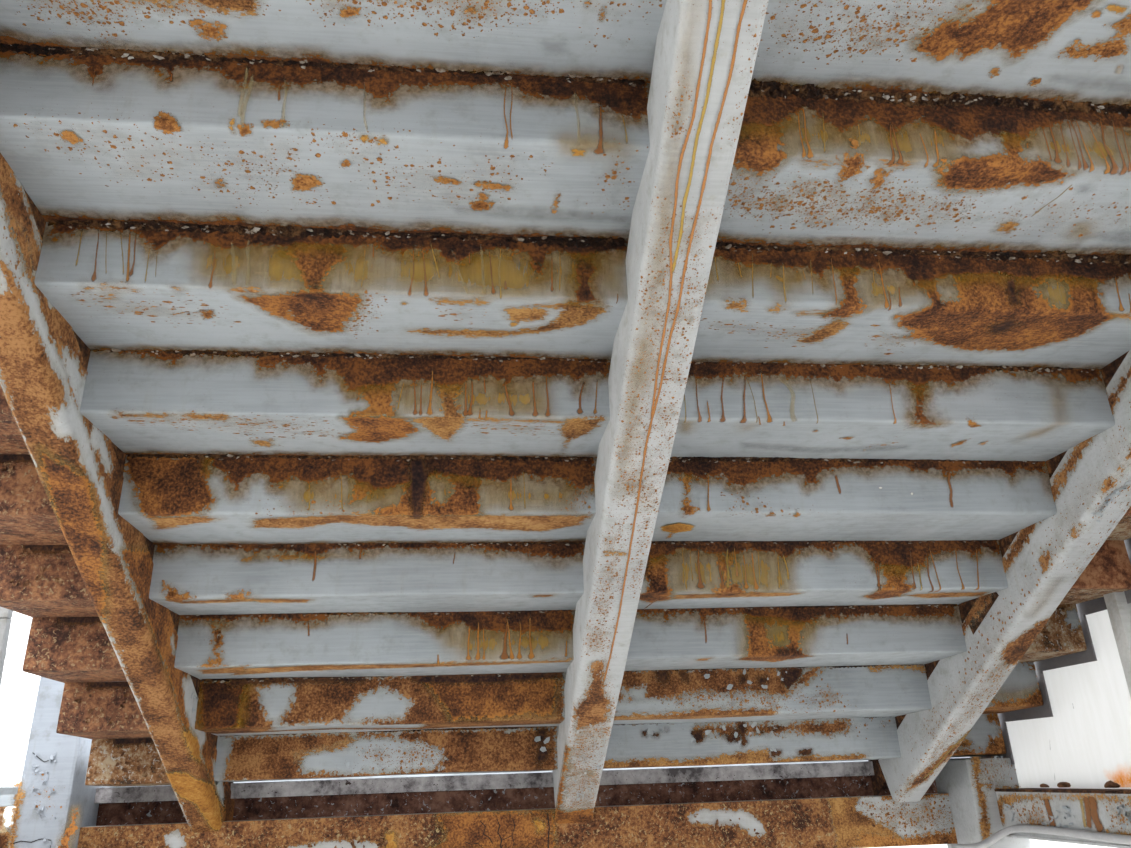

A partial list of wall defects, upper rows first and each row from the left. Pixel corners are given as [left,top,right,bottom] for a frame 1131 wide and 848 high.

rust [726,78,1131,238]
rust [71,282,214,324]